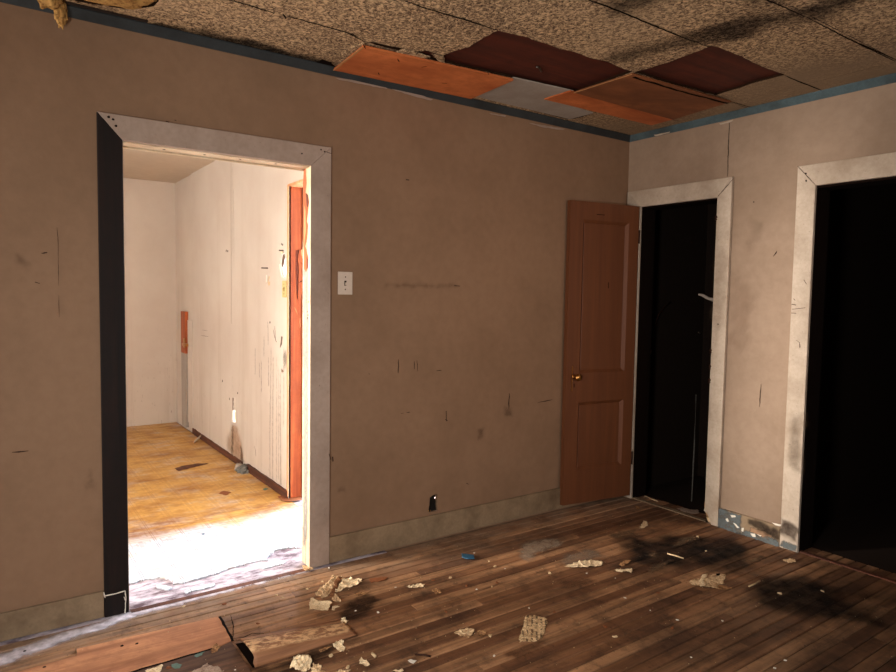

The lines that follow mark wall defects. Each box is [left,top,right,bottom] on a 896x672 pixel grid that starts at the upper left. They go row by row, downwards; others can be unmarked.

peeling [337,78,432,100]
peeling [718,509,797,551]